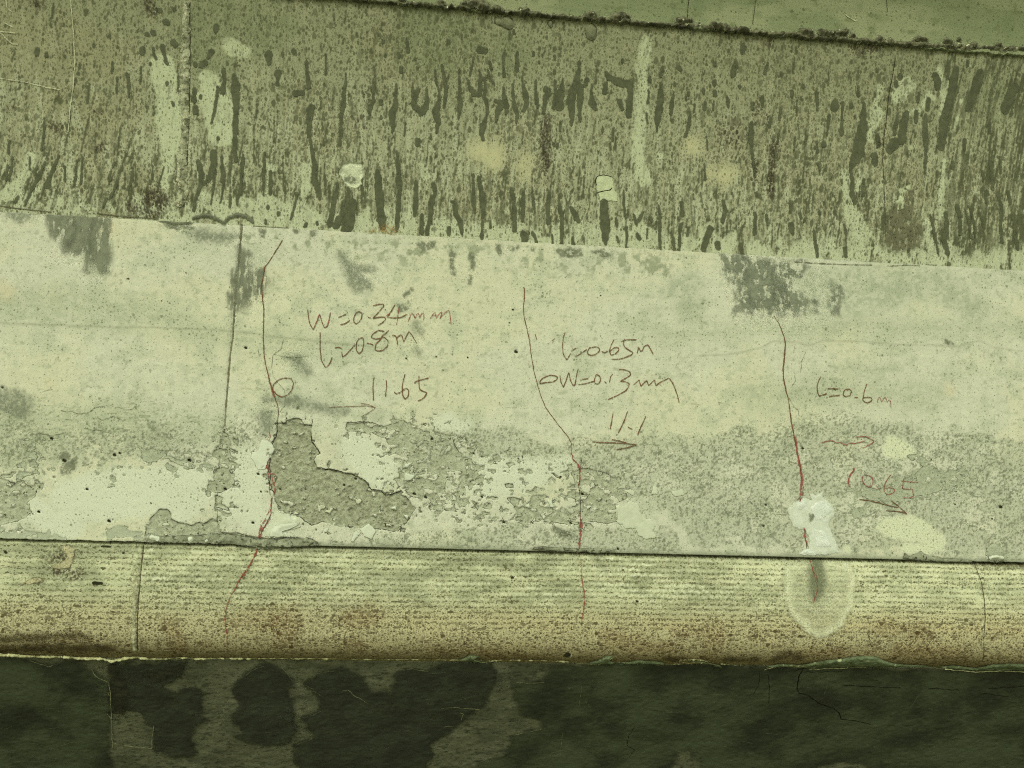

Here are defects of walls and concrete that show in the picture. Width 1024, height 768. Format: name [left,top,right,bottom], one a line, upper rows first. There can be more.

water stain [46,161,233,274]
water stain [165,67,245,212]
water stain [259,48,357,237]
water stain [374,150,437,250]
water stain [362,37,634,169]
water stain [496,186,690,257]
water stain [701,199,816,316]
water stain [790,60,984,205]
water stain [886,159,1019,255]
crack [258,342,393,534]
spalling [94,407,658,545]
water stain [782,492,856,637]